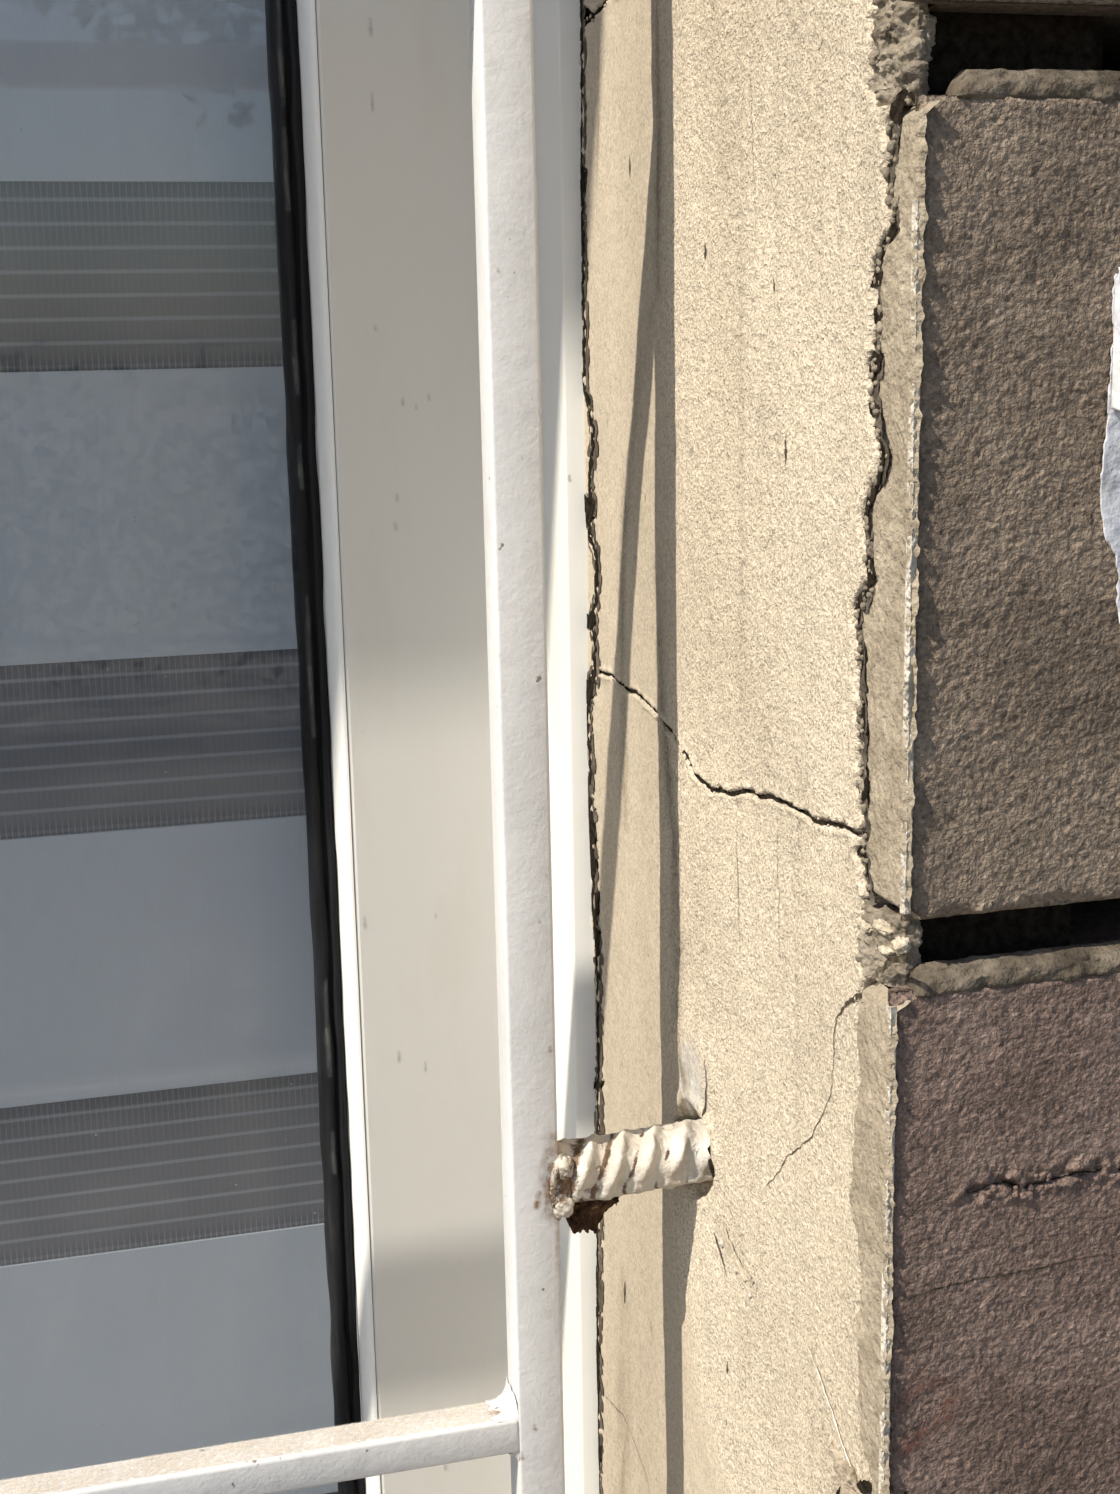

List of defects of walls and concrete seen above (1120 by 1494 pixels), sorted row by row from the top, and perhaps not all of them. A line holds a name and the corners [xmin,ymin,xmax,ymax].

spalling [862,0,937,107]
crack [580,0,908,1135]
spalling [855,898,923,988]
crack [766,955,906,1186]
corrosion [535,1166,619,1234]
crack [971,1167,1120,1203]
crack [914,1258,1076,1298]
crack [596,1218,604,1494]
flaking render [828,1440,872,1494]